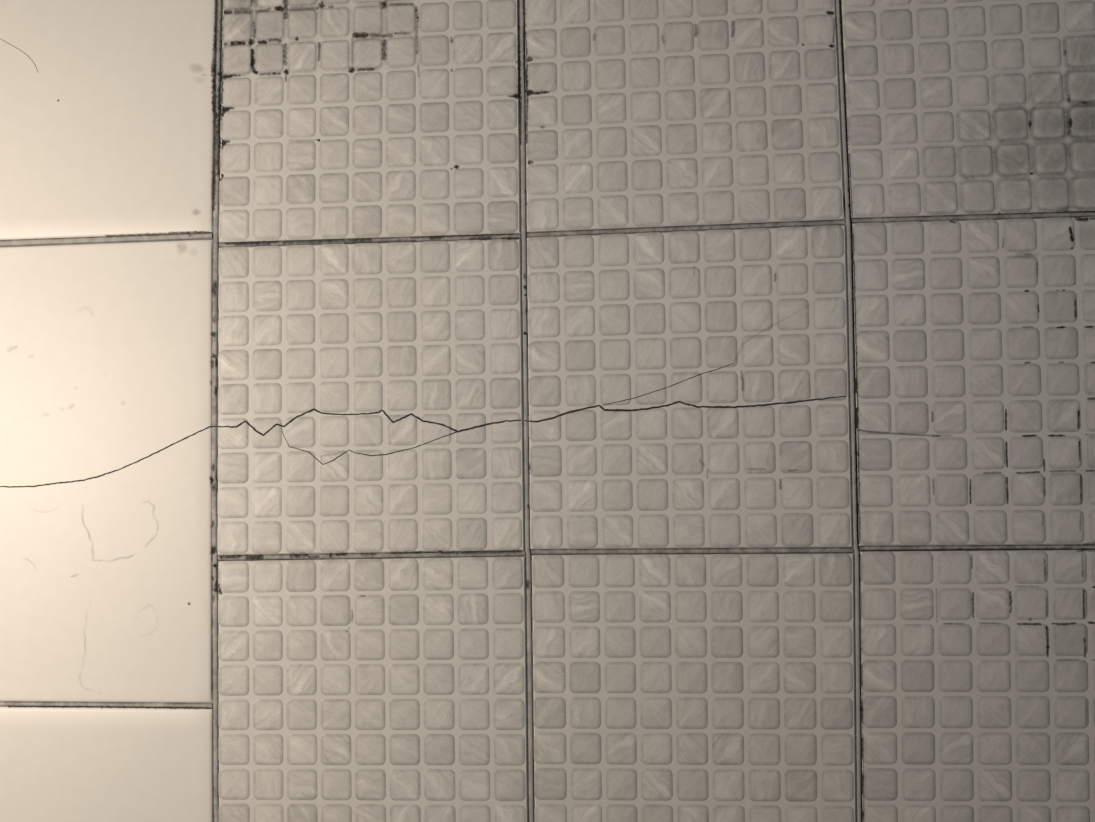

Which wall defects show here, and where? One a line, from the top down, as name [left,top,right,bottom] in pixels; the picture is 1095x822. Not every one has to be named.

crack [0,363,846,488]